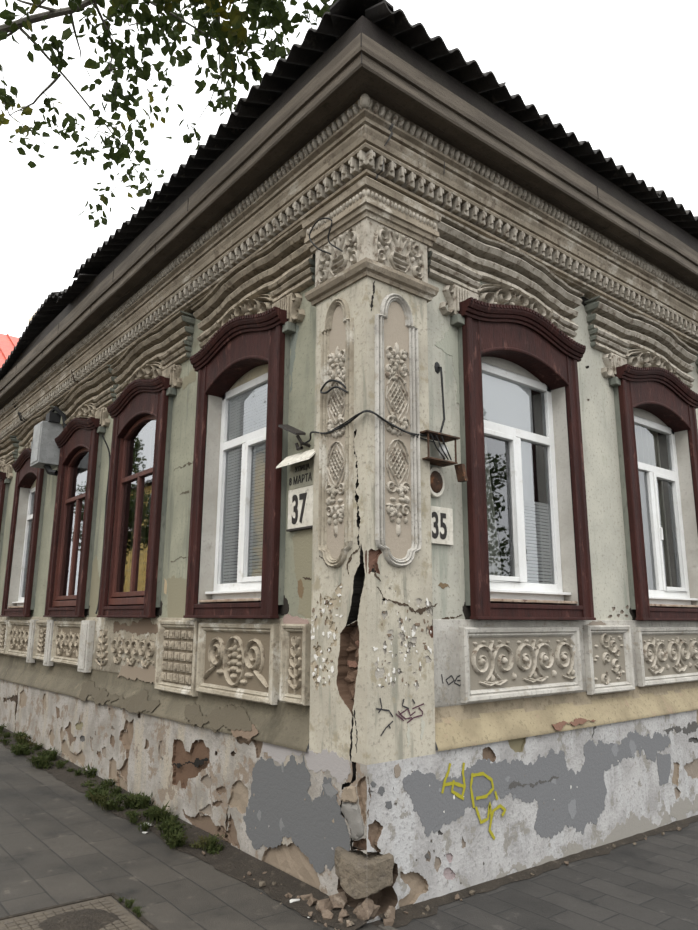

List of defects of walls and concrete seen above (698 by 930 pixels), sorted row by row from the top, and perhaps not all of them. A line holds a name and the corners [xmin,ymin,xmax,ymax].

crack [340,710,374,850]